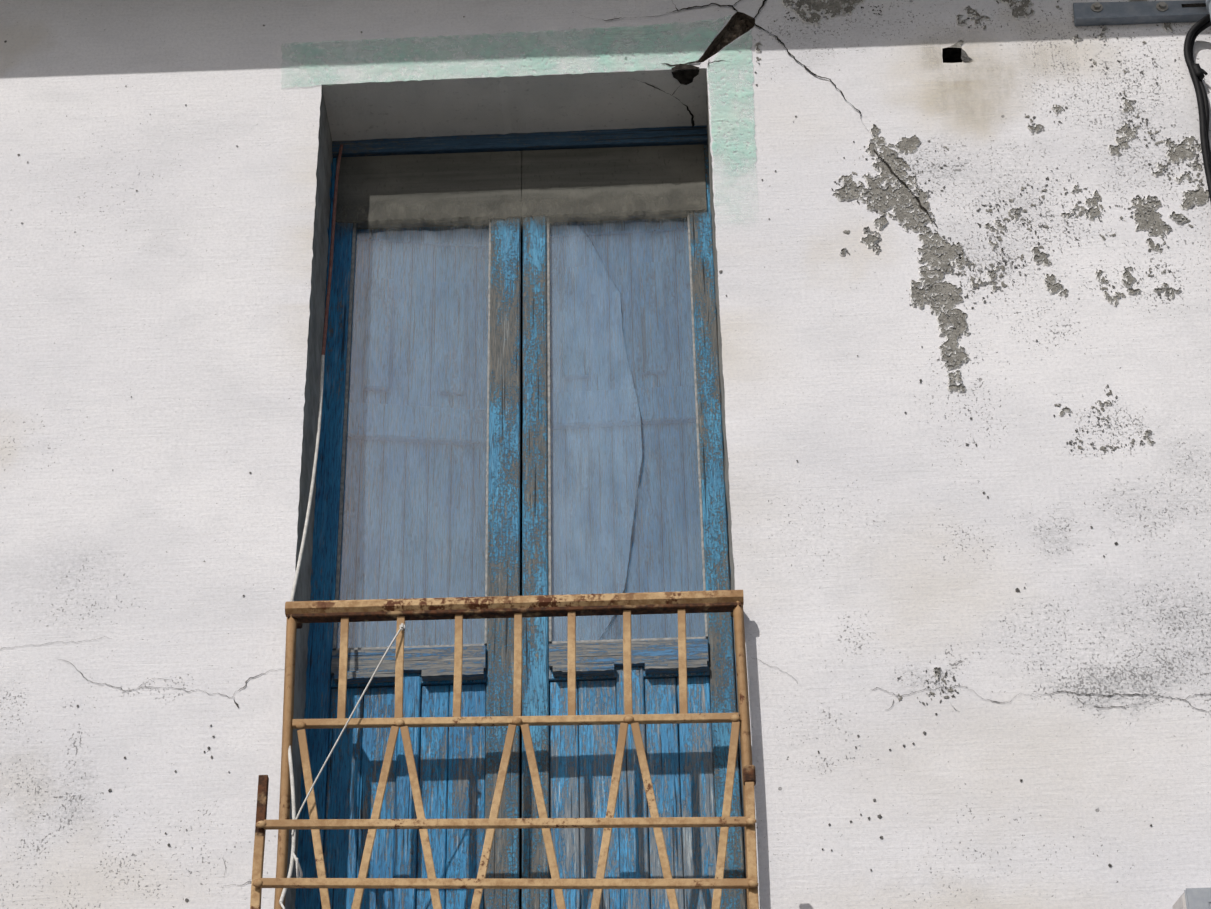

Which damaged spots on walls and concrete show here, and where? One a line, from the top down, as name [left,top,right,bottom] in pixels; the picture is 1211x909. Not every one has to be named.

crack [628,78,695,127]
peeling [584,0,1209,393]
crack [873,149,937,226]
peeling [1066,384,1155,455]
crack [3,638,282,708]
crack [873,685,1211,713]